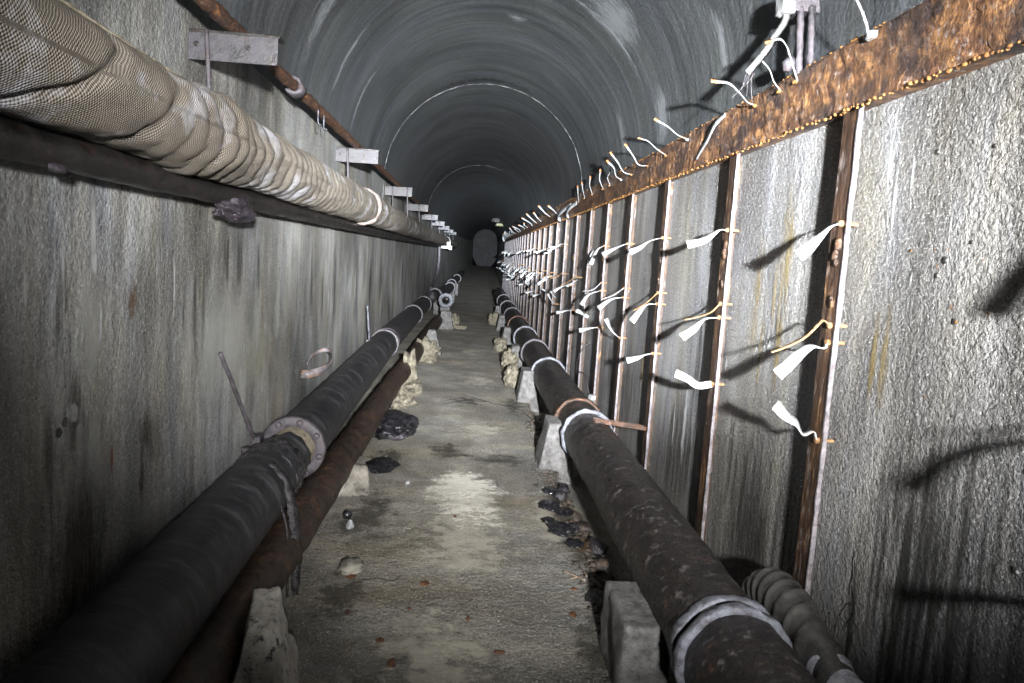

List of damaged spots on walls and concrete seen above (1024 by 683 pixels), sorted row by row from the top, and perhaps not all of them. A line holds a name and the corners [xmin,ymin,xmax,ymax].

damp [342,498,396,539]